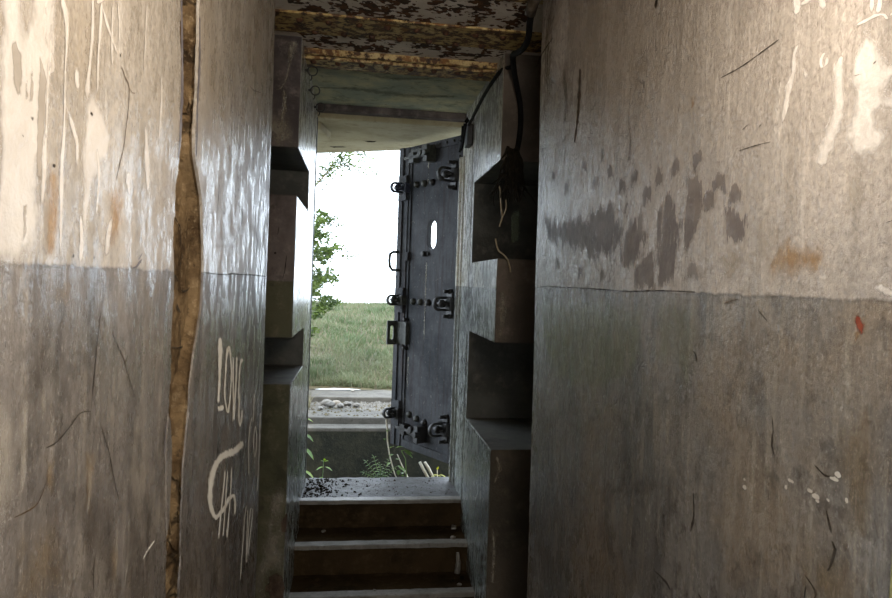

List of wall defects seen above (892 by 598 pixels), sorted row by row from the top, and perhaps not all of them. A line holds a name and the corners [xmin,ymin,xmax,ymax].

peeling [287,0,527,30]
peeling [297,32,506,61]
crack [164,0,287,456]